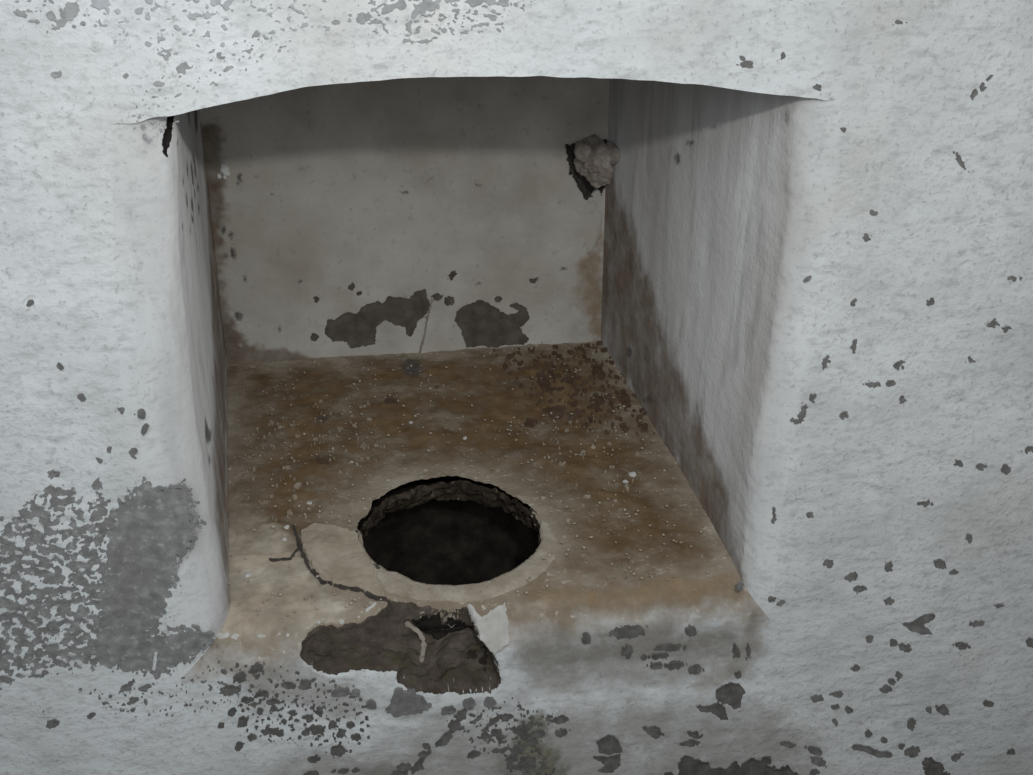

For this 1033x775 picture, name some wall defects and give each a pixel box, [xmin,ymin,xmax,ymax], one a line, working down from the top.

peeling [13,0,128,44]
peeling [128,0,532,141]
spalling [310,282,655,481]
water stain [219,349,701,644]
peeling [0,396,571,775]
crack [269,525,393,612]
peeling [890,613,936,652]
peeling [879,671,903,693]
peeling [810,691,853,726]
spalling [593,734,622,773]
peeling [664,730,827,775]
peeling [852,729,964,775]